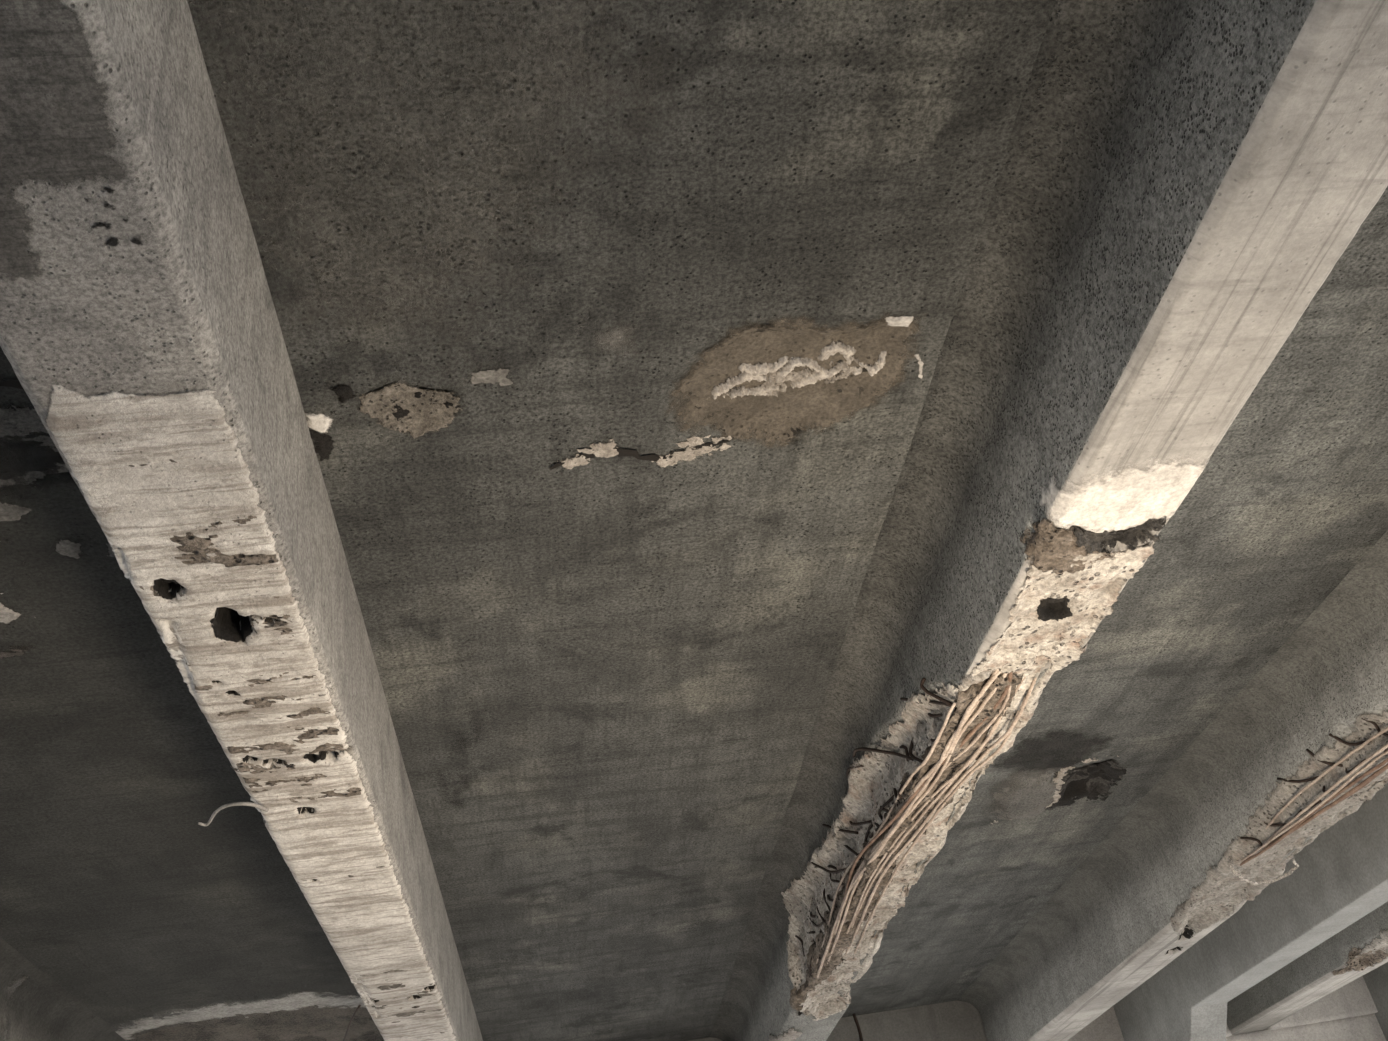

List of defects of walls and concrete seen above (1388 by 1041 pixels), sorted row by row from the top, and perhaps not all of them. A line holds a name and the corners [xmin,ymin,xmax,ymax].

peeling [470,368,513,386]
spalling [669,316,924,448]
spalling [0,382,462,1041]
corrosion [789,674,1023,1011]
spalling [769,453,1213,1041]
spalling [1165,710,1388,955]
spalling [1332,929,1388,976]